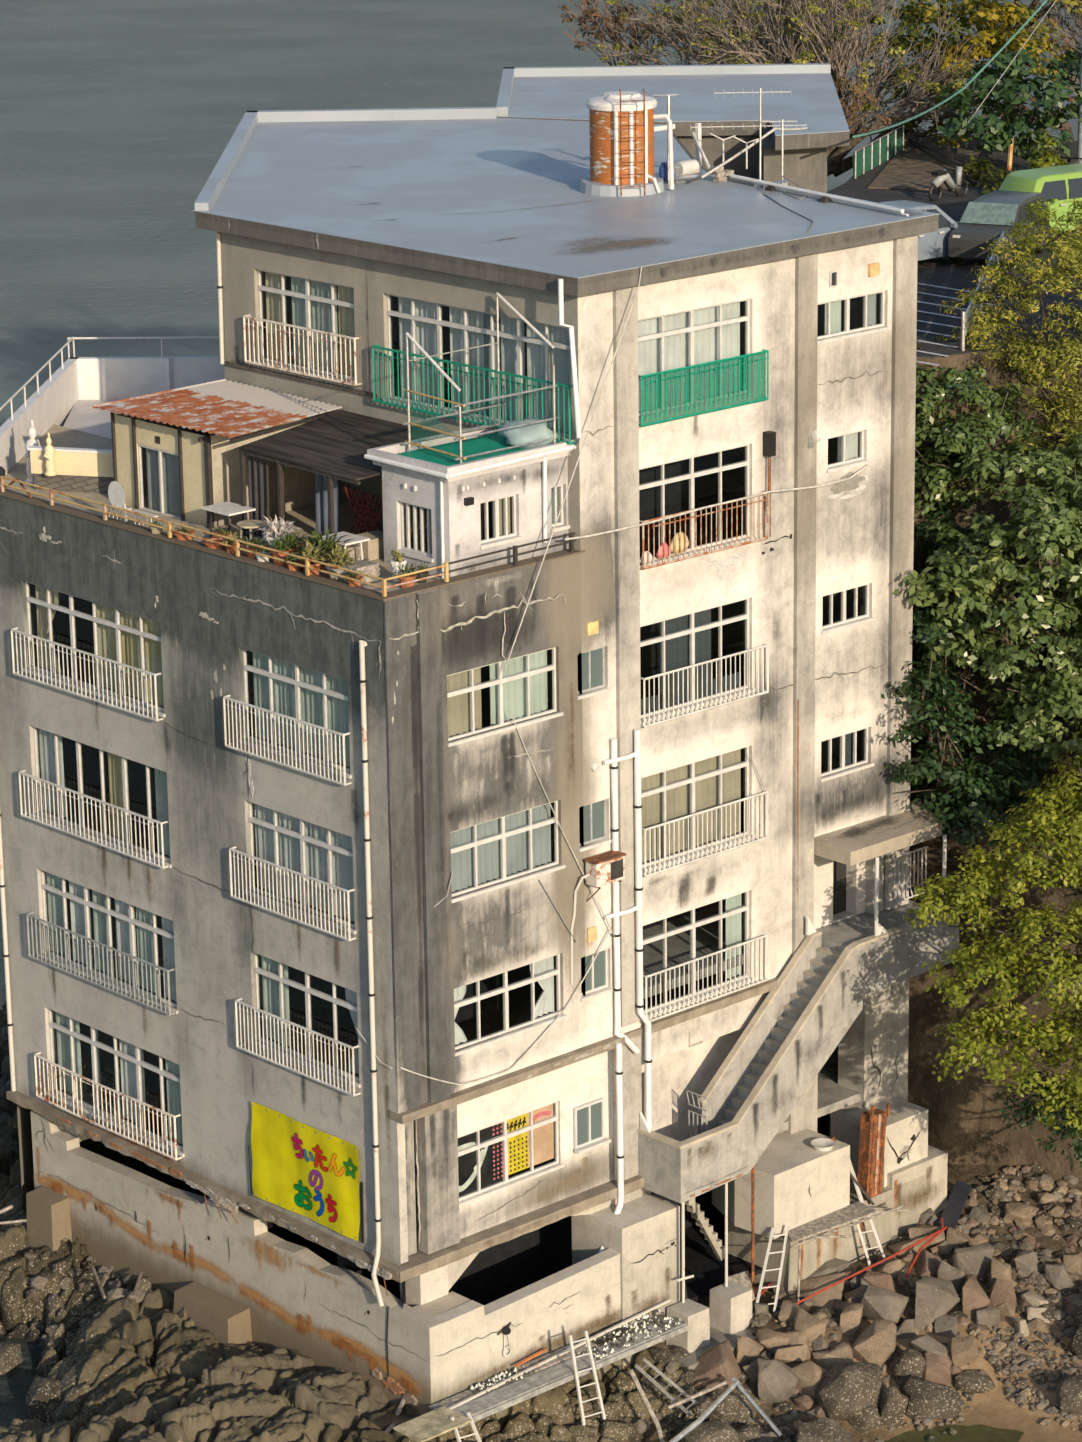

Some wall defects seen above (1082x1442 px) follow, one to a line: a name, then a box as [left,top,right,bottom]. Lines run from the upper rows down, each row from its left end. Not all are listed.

damp [580,239,657,252]
crack [210,588,566,677]
damp [502,733,531,794]
crack [871,1046,899,1093]
corrosion [37,1149,419,1394]